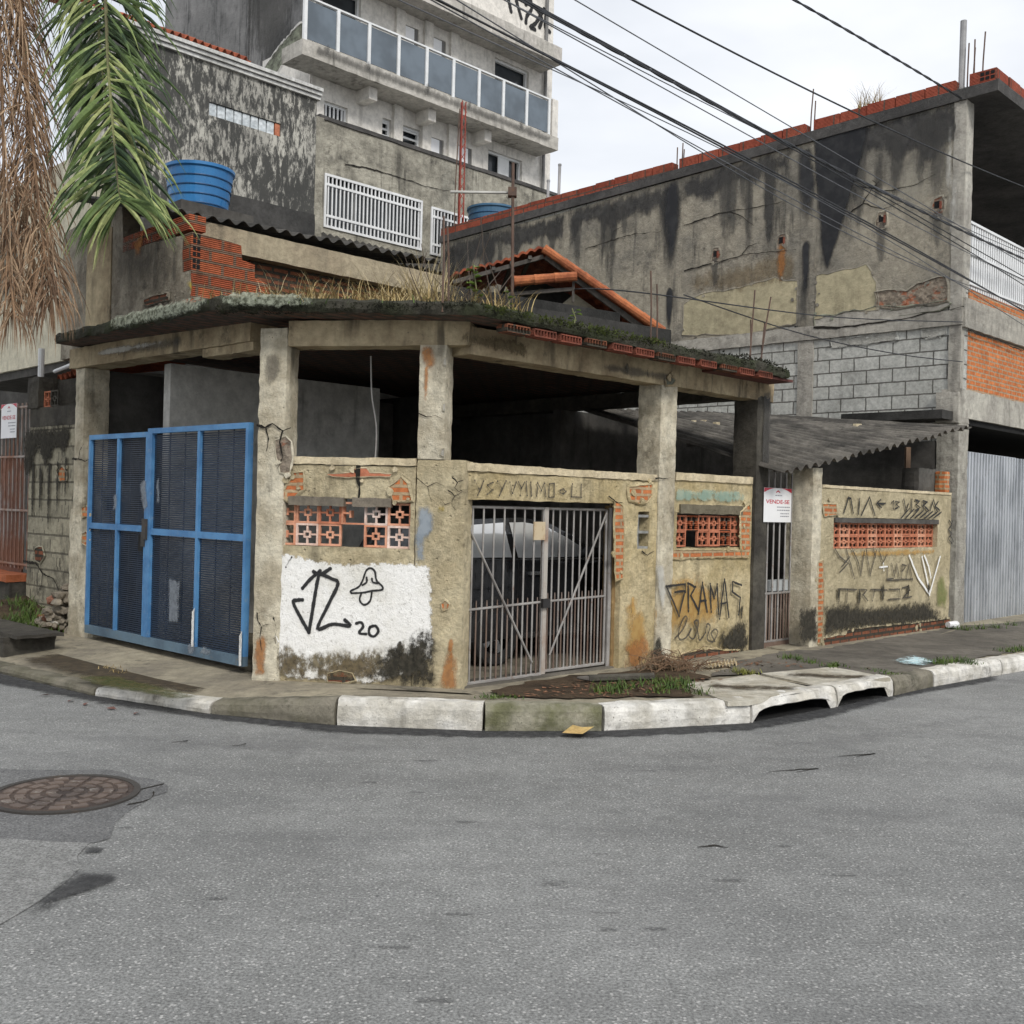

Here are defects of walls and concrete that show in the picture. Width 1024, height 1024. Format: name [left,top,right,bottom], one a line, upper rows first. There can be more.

leakage [445,104,956,317]
crack [684,198,796,272]
peeling [813,263,952,326]
rust [422,347,433,396]
leakage [23,425,70,523]
crack [256,423,290,467]
spalling [274,435,306,503]
crack [416,477,463,510]
spalling [611,479,653,582]
leakage [799,584,947,642]
leakage [277,632,436,685]
rust [442,639,456,689]